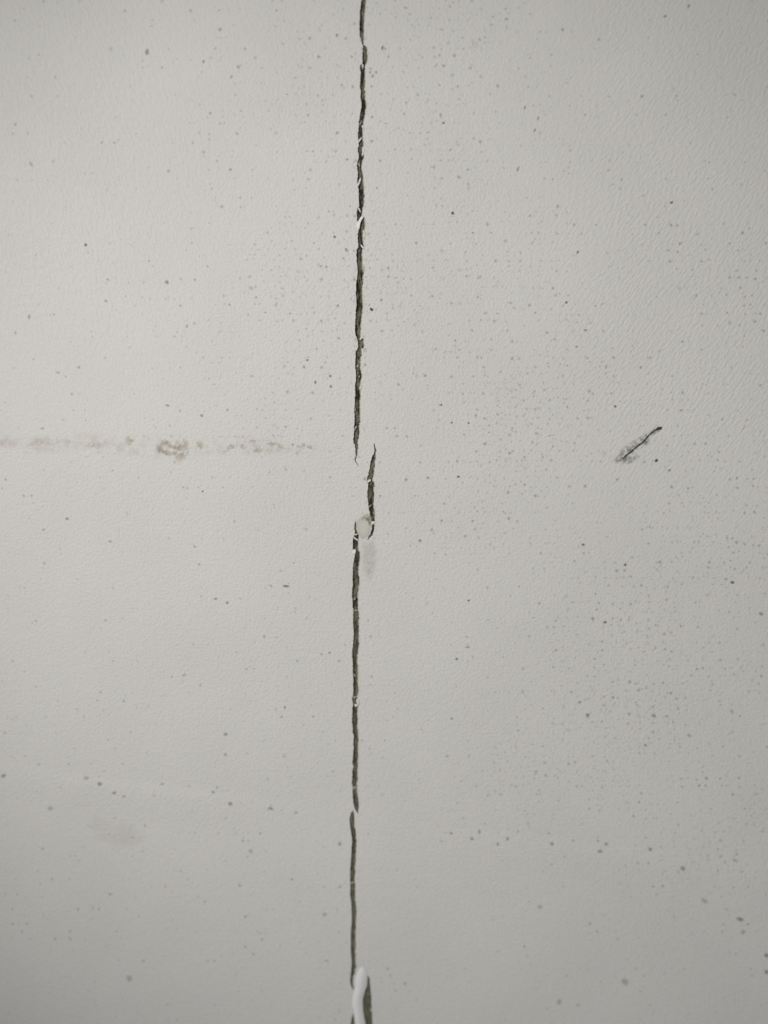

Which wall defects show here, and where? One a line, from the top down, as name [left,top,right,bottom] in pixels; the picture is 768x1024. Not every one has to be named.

crack [349,0,377,1024]